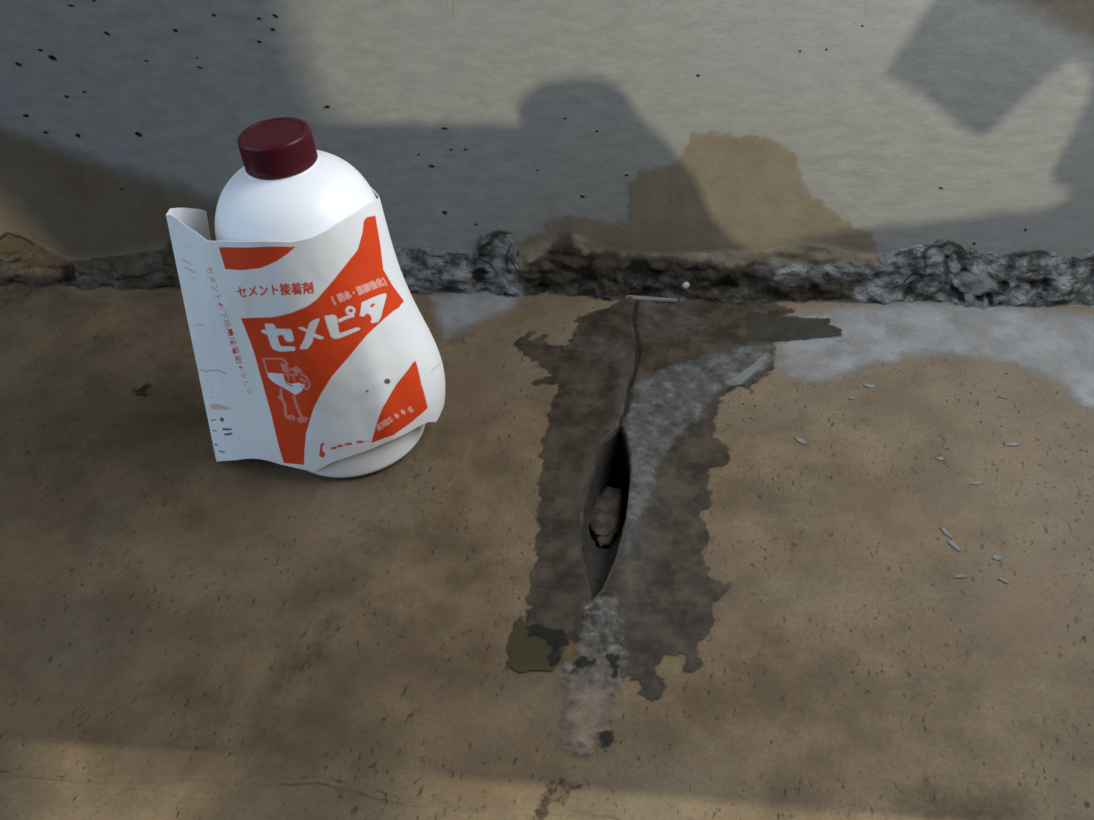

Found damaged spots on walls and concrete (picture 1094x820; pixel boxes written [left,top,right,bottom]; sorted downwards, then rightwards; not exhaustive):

peeling [948,255,997,309]
crack [578,295,640,602]
water stain [507,131,880,754]